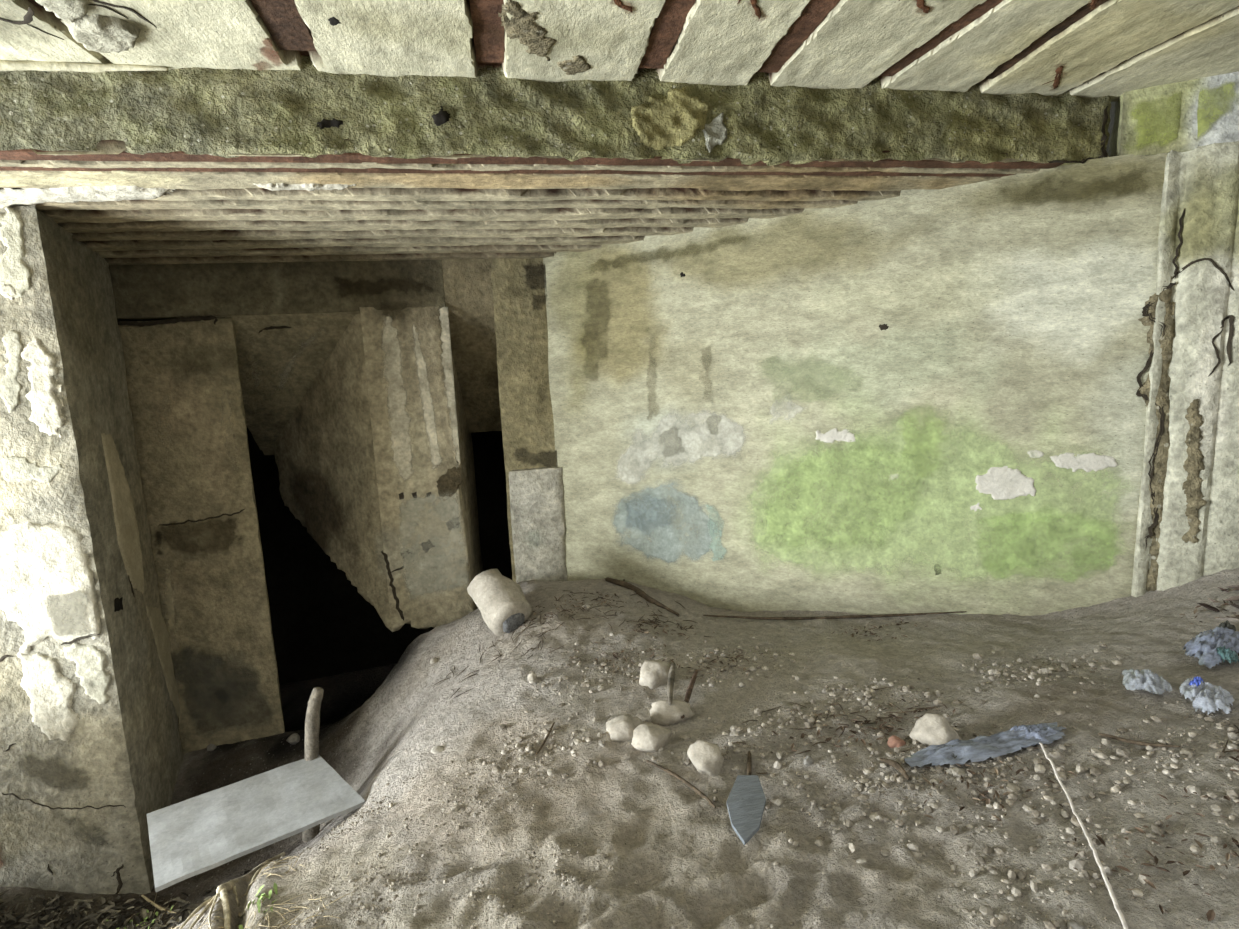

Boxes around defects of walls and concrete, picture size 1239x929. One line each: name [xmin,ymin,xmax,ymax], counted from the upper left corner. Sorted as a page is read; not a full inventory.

peeling [35,0,157,53]
flaking render [254,183,357,191]
flaking render [0,185,175,300]
crack [1172,208,1234,376]
flaking render [0,330,66,438]
flaking render [2,456,65,483]
water stain [613,413,744,563]
water stain [766,446,919,547]
flaking render [0,520,111,744]
water stain [101,433,272,731]
crack [381,550,409,621]
crack [2,793,125,810]